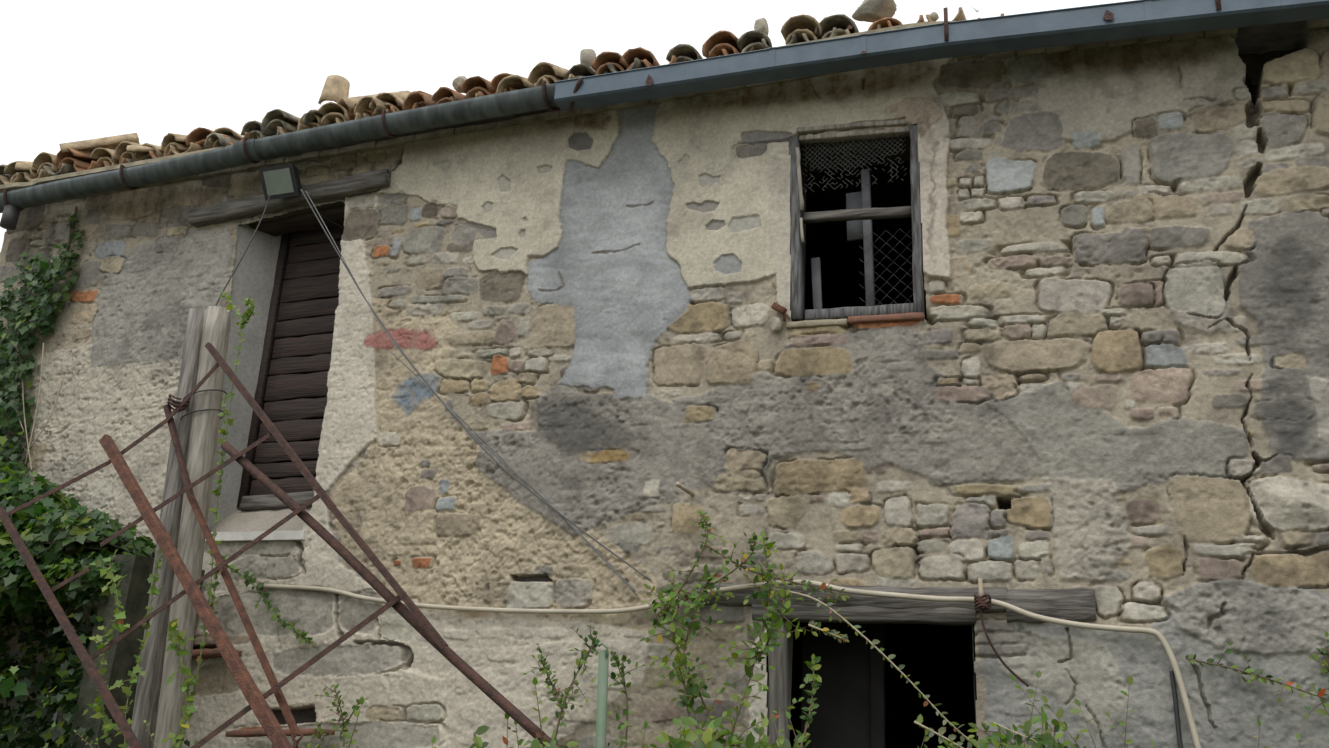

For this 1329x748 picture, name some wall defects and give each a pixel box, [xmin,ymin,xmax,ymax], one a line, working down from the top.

flaking render [340,104,762,403]
flaking render [761,469,1057,580]
flaking render [933,53,1039,233]
crack [1178,65,1329,729]